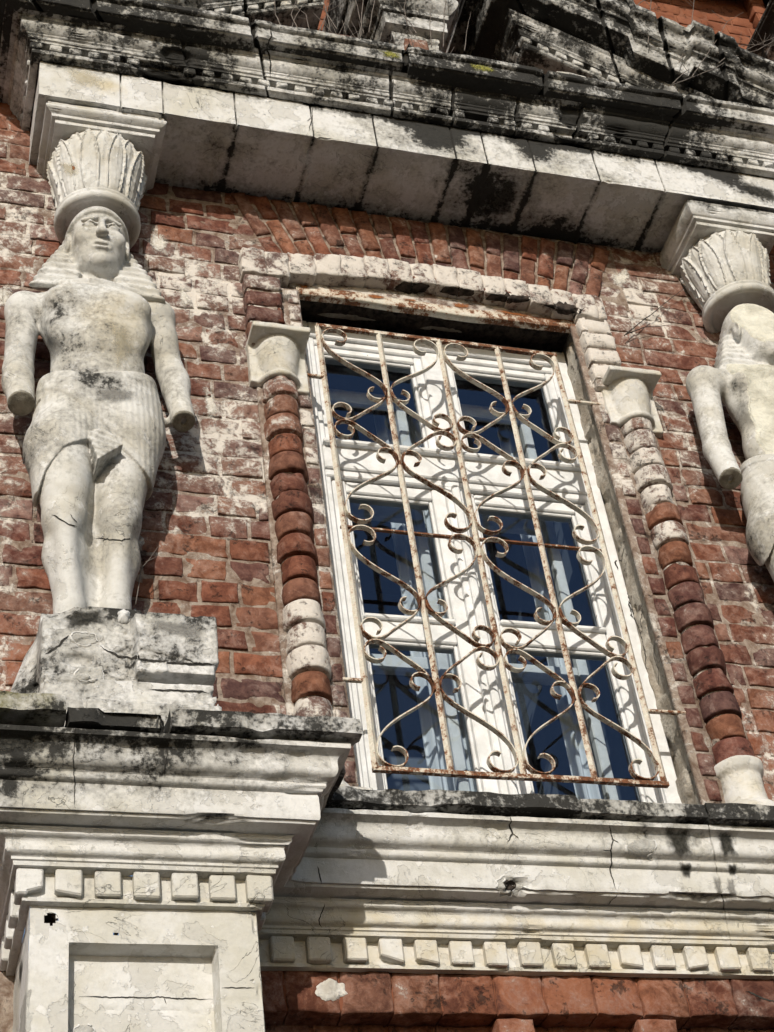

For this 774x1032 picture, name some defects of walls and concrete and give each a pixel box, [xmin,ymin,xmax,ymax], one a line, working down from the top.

water stain [484,180,516,214]
crack [46,635,69,654]
water stain [0,738,41,751]
crack [604,826,619,904]
water stain [666,827,691,876]
water stain [715,833,737,896]
flaking render [19,986,32,1032]
crack [79,987,252,1003]